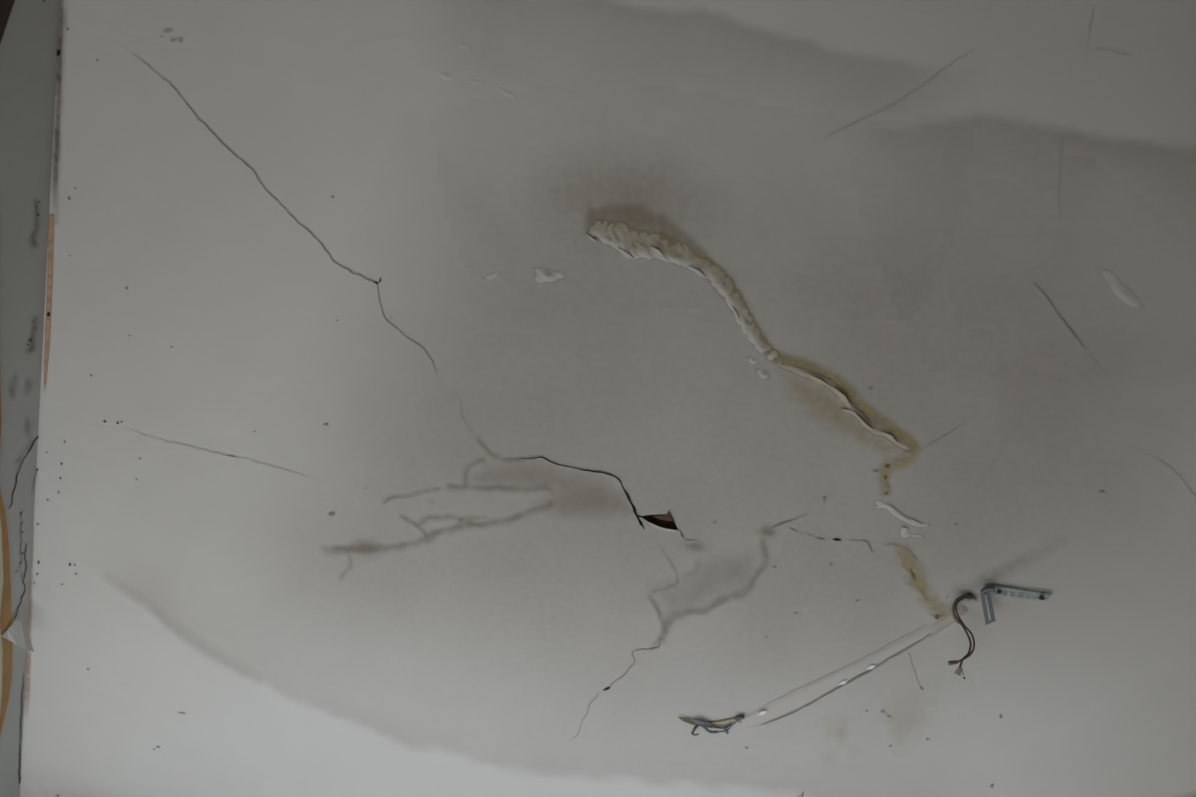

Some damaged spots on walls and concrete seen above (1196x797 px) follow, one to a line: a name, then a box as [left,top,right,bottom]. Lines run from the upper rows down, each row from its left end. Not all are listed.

crack [133,54,478,441]
crack [126,428,308,477]
crack [503,457,645,530]
peeling [778,364,912,453]
peeling [870,500,932,539]
crack [572,639,661,739]